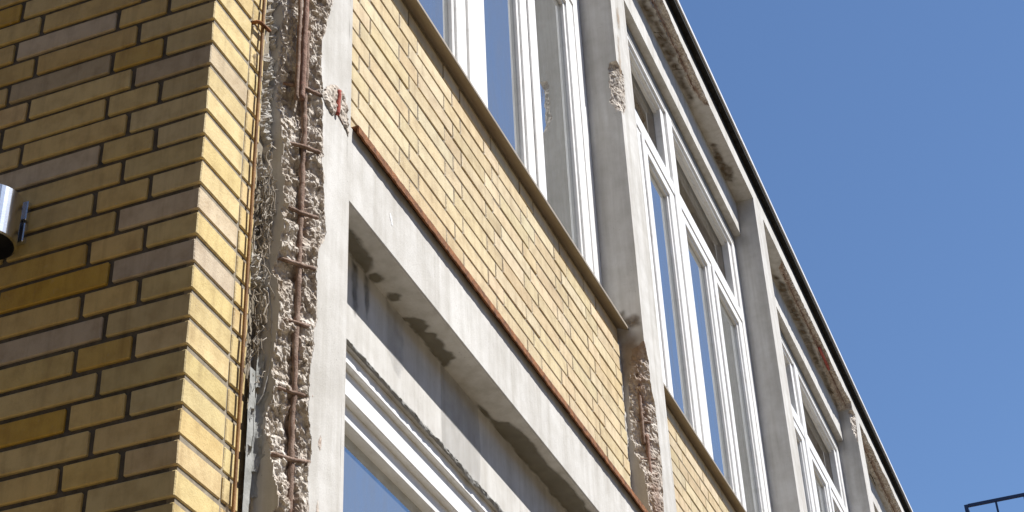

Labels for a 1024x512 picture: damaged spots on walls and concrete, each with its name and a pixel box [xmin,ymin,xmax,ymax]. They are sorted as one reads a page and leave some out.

spalling [608,60,626,114]
spalling [242,0,349,512]
water stain [348,230,382,311]
water stain [403,318,455,366]
spalling [628,341,664,512]
spalling [778,261,902,512]